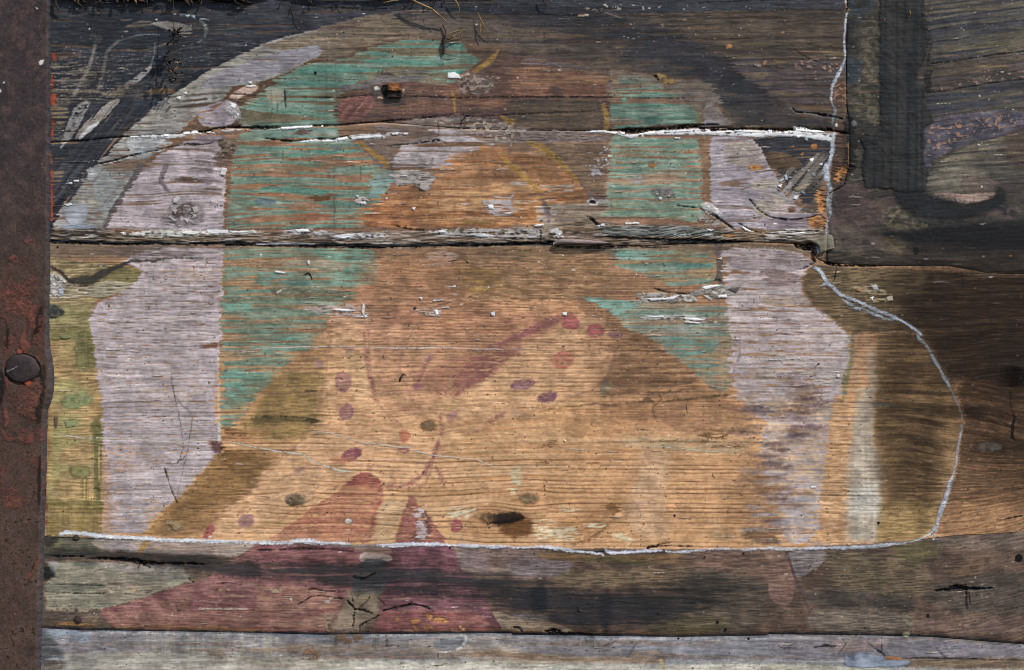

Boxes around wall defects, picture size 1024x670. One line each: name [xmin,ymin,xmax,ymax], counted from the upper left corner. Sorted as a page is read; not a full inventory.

spalling [447,72,494,94]
peeling [389,160,436,191]
peeling [415,118,849,241]
crack [54,240,151,248]
crack [451,199,876,283]
rust [1,276,42,361]
peeling [637,274,740,324]
rust [2,378,43,443]
crack [299,588,429,627]
crack [937,585,989,595]